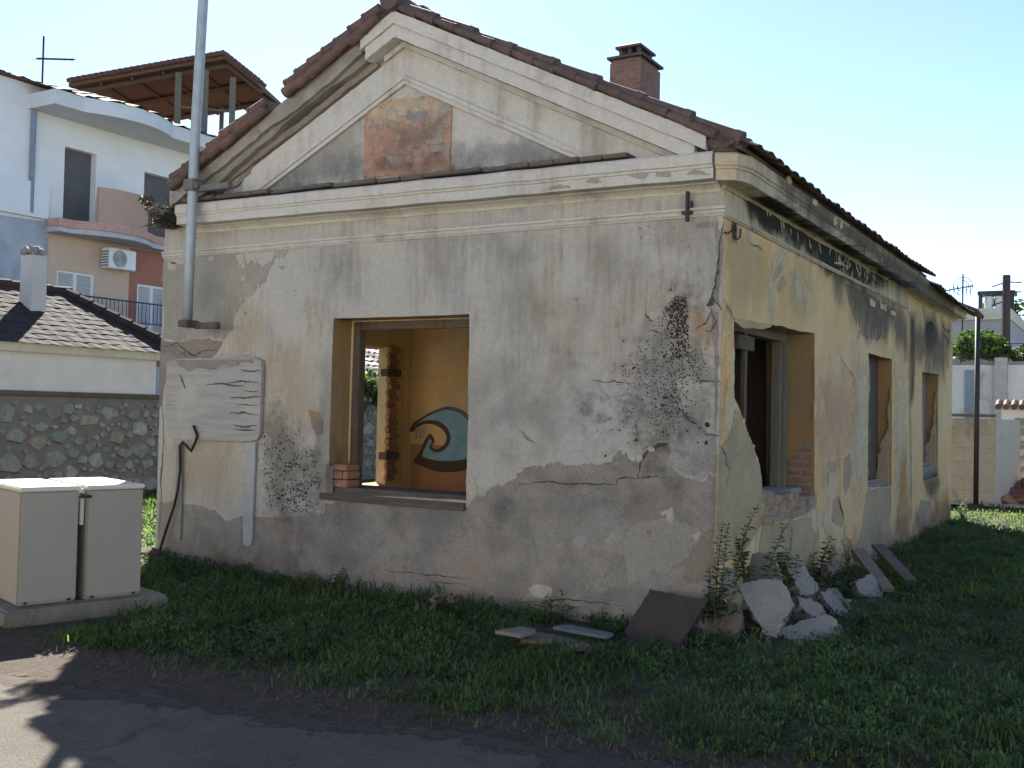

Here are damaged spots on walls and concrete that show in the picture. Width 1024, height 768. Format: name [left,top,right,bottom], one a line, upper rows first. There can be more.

flaking render [362,95,452,178]
crack [696,225,735,333]
water stain [766,210,870,275]
mould [597,289,710,449]
mould [258,416,321,515]
flaking render [158,216,852,628]
crack [518,443,669,485]
flaking render [856,388,895,566]
flaking render [916,499,950,537]